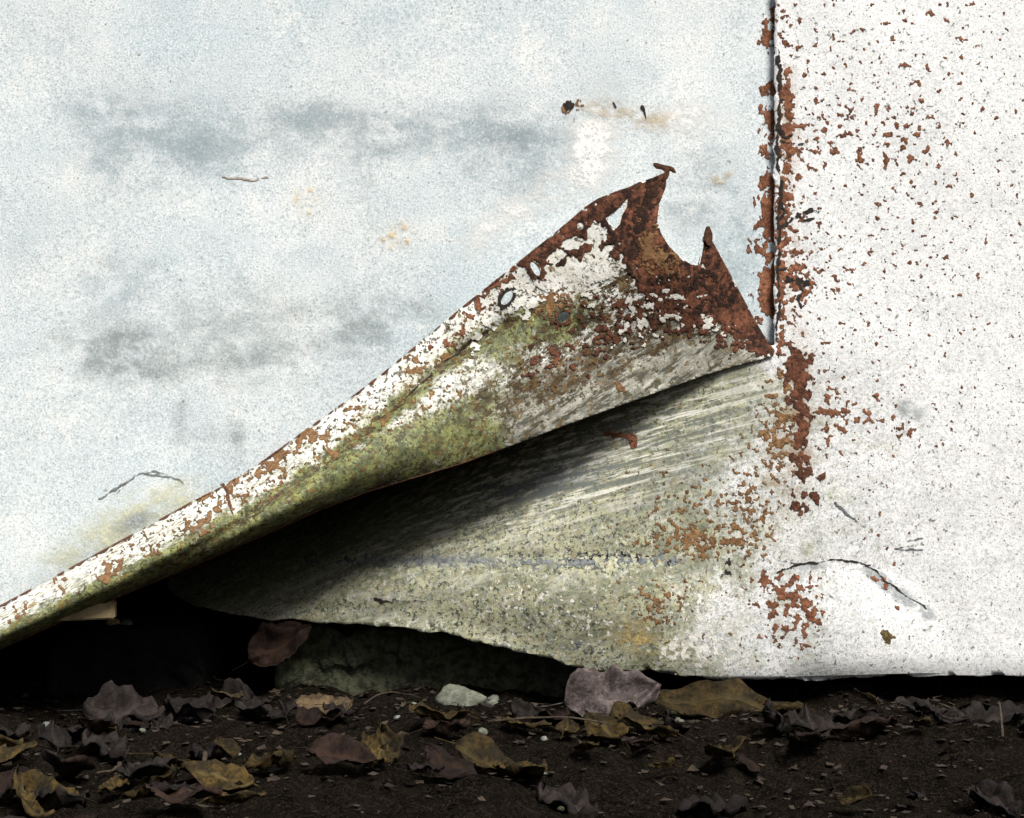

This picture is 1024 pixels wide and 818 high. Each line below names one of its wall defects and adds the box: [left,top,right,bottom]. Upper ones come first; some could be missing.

rust [925,1,1009,40]
peeling [456,270,558,356]
peeling [581,271,628,308]
peeling [610,276,736,349]
water stain [84,331,160,376]
rust [51,3,999,674]
crack [98,470,184,499]
rust [0,589,40,624]
spalling [115,577,245,619]
peeling [304,550,679,654]
peeling [646,558,741,675]
crack [777,559,927,609]